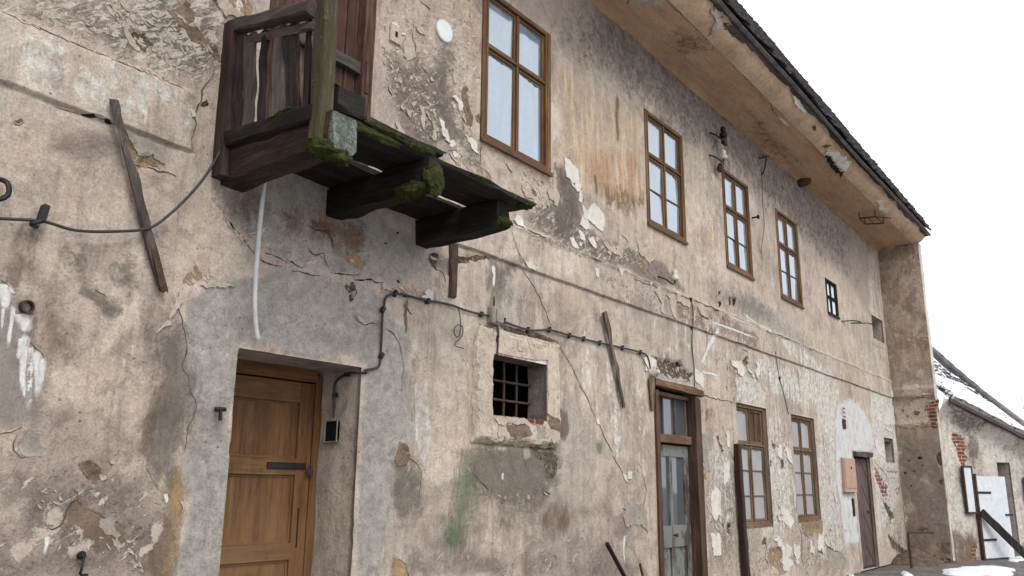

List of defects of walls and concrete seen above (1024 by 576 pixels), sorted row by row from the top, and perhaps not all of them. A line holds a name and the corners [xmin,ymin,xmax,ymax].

flaking render [4,0,221,88]
peeling [382,22,482,172]
leakage [561,19,849,273]
leakage [0,226,46,424]
flaking render [9,490,144,573]
crack [156,286,197,452]
crack [225,219,380,283]
flaking render [494,413,561,444]
crack [512,215,623,473]
flaking render [702,430,735,557]
flaking render [750,439,815,575]
flaking render [874,369,939,553]